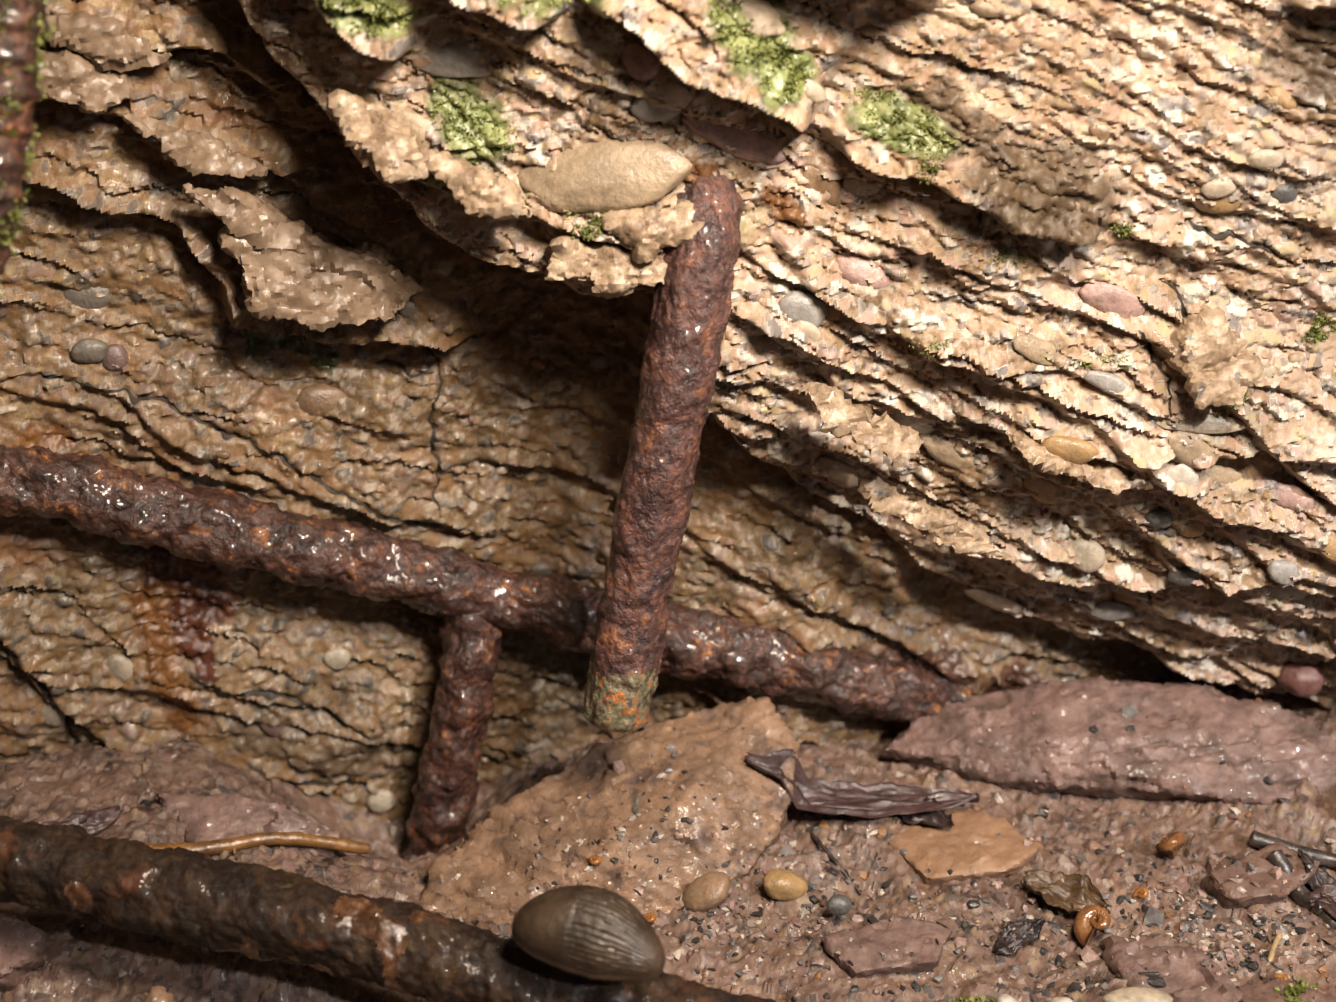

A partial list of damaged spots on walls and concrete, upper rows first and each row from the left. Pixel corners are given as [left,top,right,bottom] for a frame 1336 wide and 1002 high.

spalling [544,199,705,299]
rust [684,162,722,184]
rust [757,186,806,229]
rust [6,418,78,453]
crack [42,346,511,536]
spalling [798,381,924,467]
spalling [1006,431,1156,496]
spalling [858,476,1017,563]
rust [132,545,244,736]
crack [0,641,106,747]
crack [189,676,384,741]
crack [284,779,367,787]